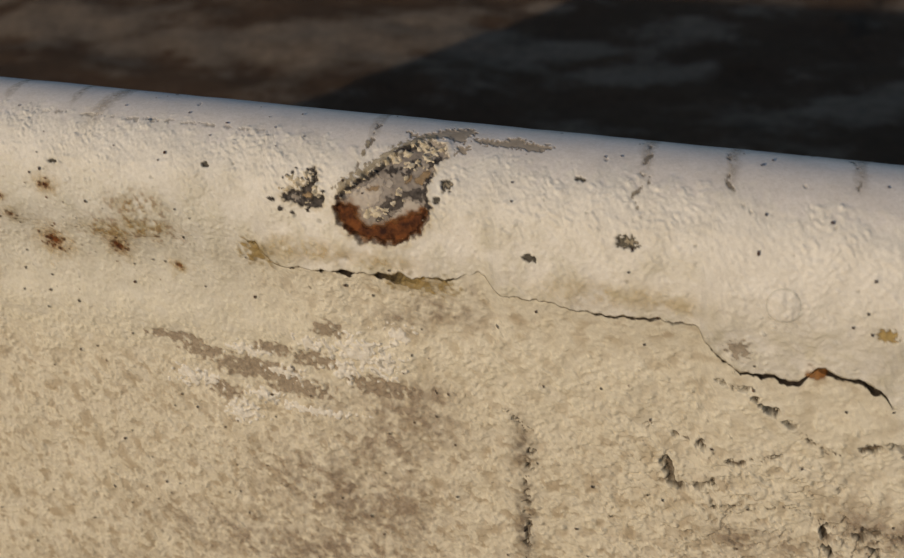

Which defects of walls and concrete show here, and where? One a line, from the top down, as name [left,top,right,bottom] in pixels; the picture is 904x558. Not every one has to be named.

peeling [267,128,555,246]
rust [94,219,161,251]
crack [239,241,454,294]
crack [517,297,891,424]
crack [807,439,899,456]